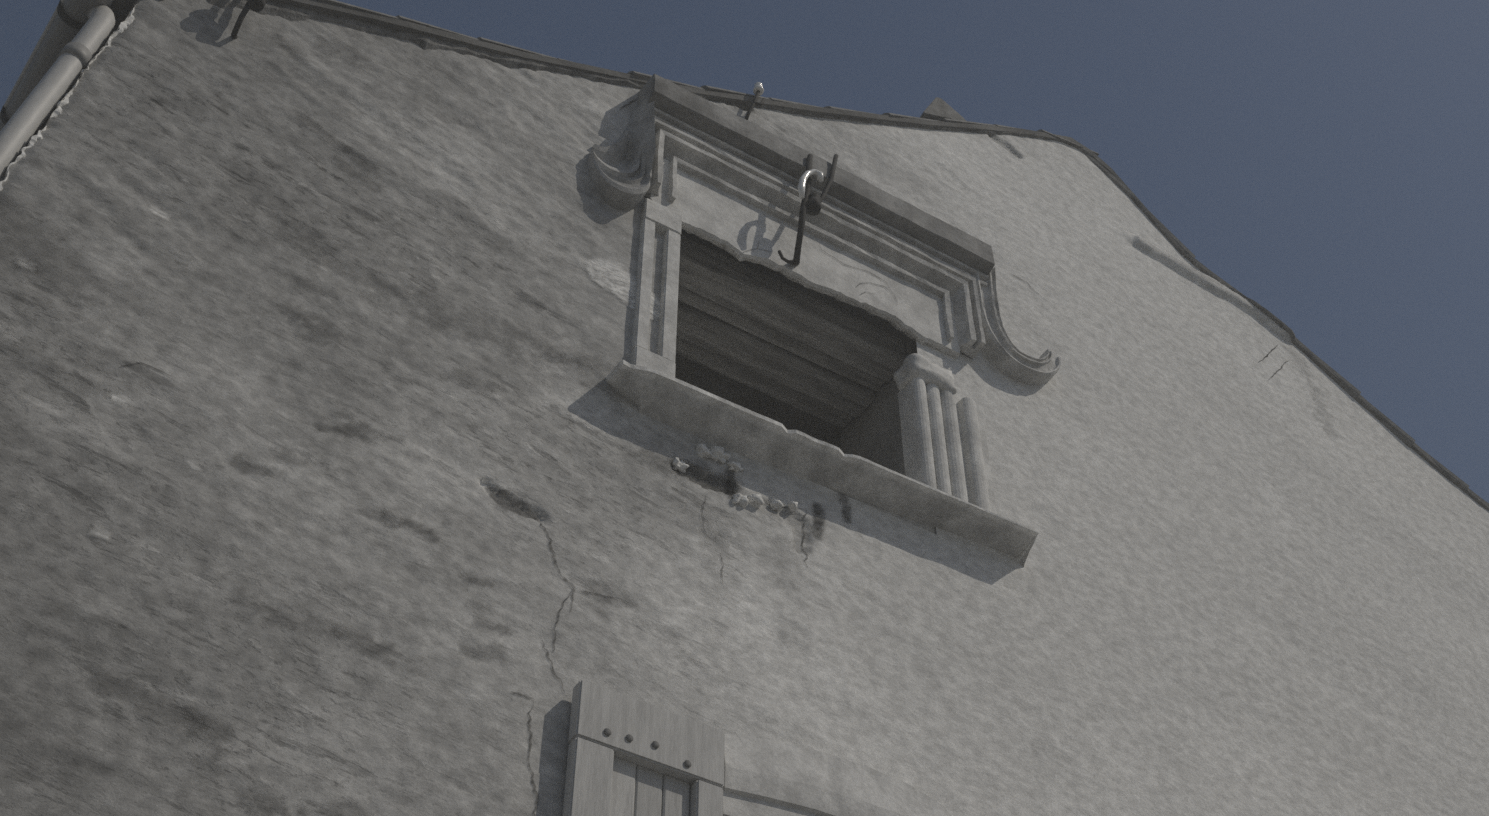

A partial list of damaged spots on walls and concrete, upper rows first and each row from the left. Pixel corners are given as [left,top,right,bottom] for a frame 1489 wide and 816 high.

spalling [671,443,798,512]
crack [541,525,598,678]
crack [513,692,538,815]